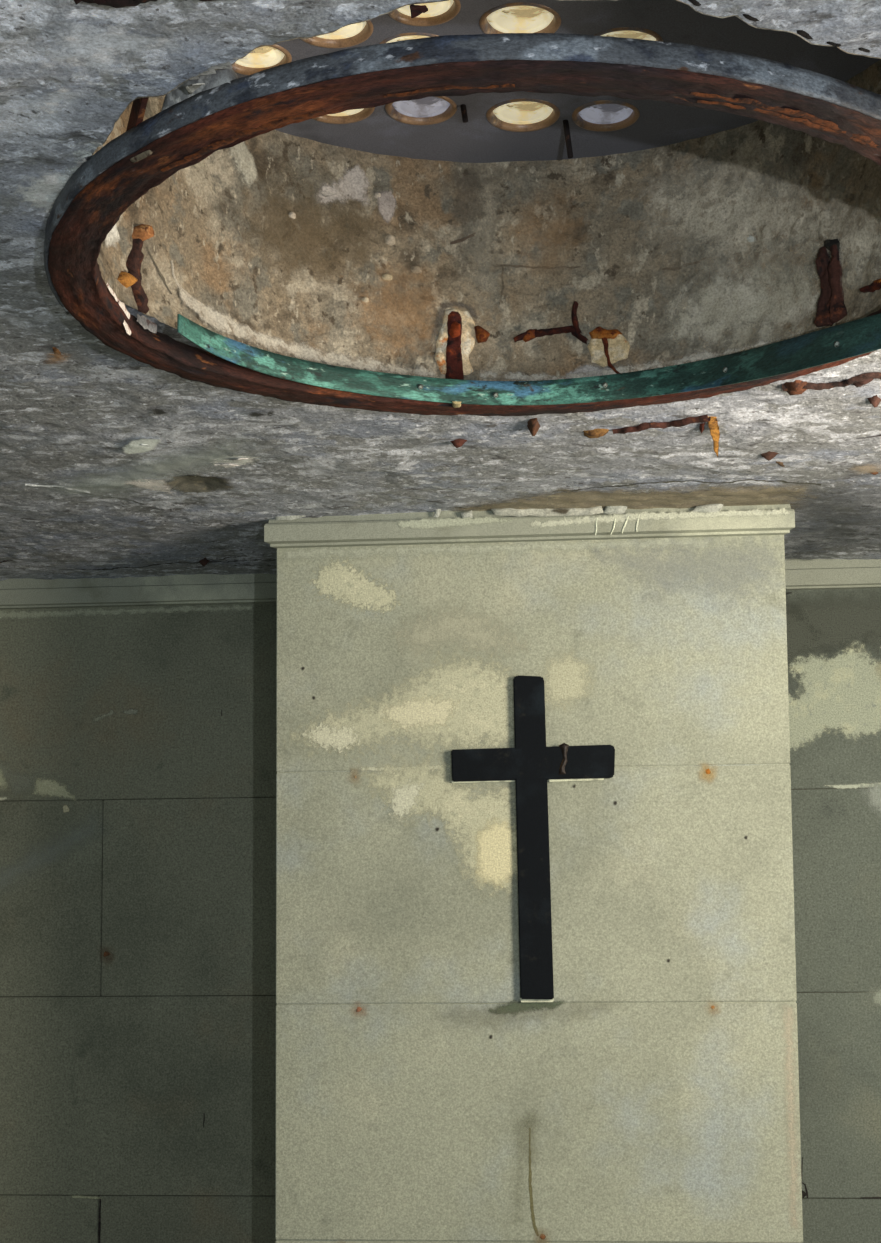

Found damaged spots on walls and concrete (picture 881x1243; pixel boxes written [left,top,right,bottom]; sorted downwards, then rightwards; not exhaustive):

peeling [130,150,153,163]
peeling [230,142,257,183]
peeling [319,166,396,222]
peeling [106,224,120,246]
peeling [645,164,881,354]
peeling [106,282,157,335]
spalling [434,302,490,375]
spalling [513,301,630,379]
rust [867,395,881,408]
water stain [786,596,881,667]